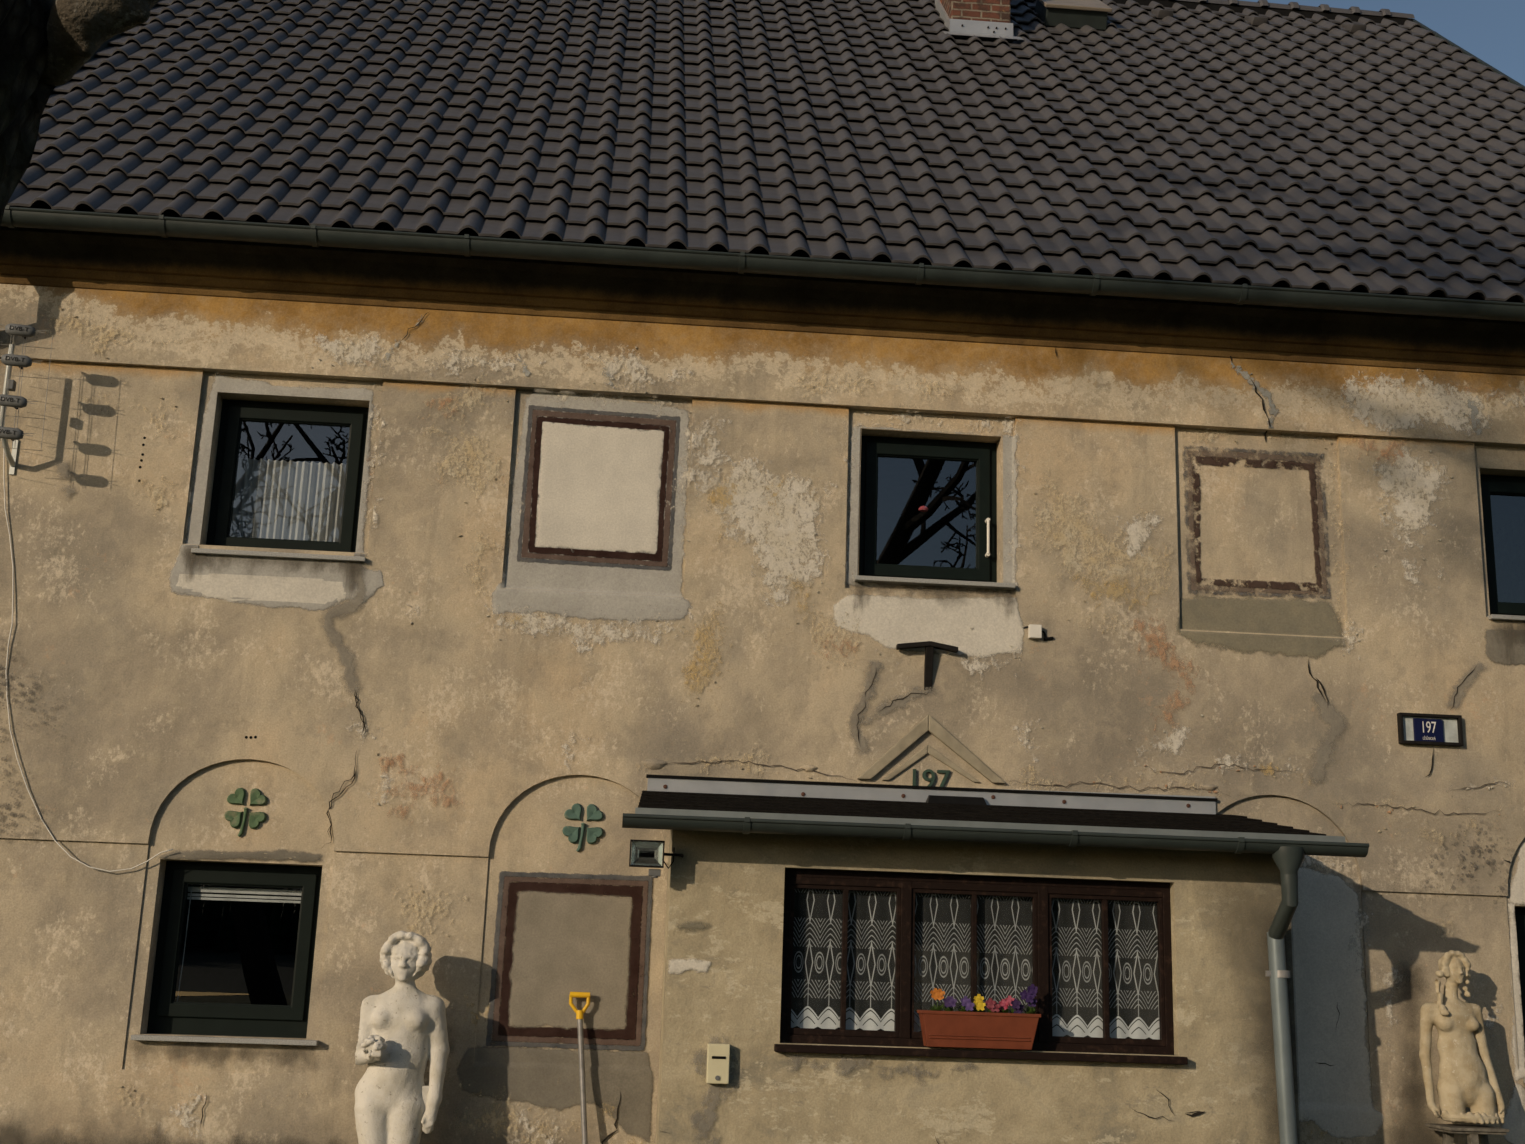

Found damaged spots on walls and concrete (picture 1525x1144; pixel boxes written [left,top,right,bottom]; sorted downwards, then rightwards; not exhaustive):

peeling [311,334,380,368]
peeling [971,417,1018,437]
crack [1230,356,1280,441]
peeling [544,344,866,611]
peeling [962,645,1022,680]
crack [322,564,366,848]
crack [666,661,932,781]
peeling [1303,855,1343,870]
peeling [456,1083,574,1144]
flaking render [1501,1083,1525,1144]